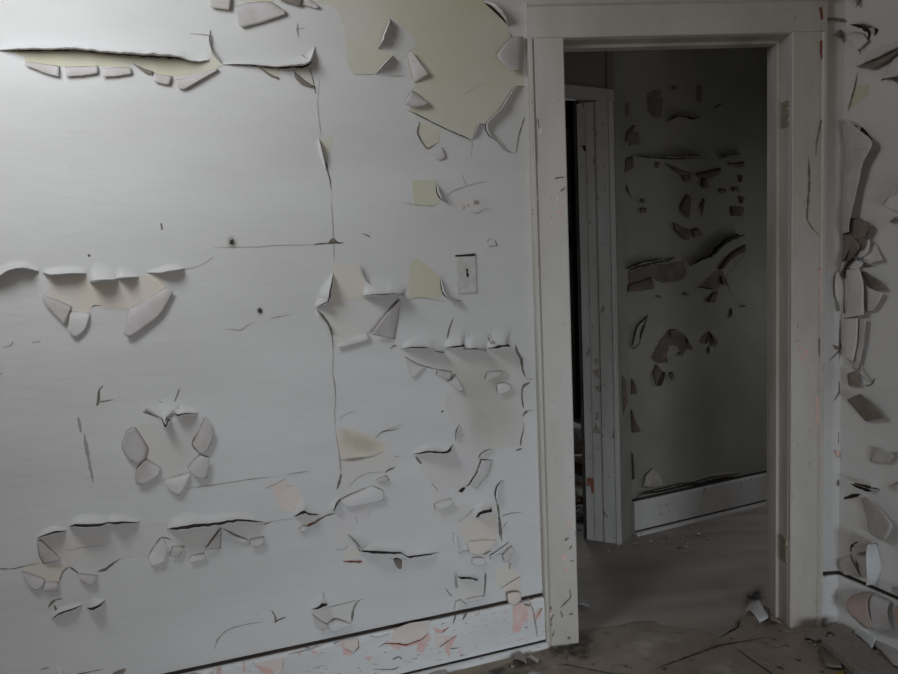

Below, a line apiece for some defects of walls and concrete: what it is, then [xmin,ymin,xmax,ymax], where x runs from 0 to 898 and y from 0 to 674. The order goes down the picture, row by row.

peeling [0,30,316,94]
peeling [209,0,526,160]
peeling [0,254,211,338]
crack [313,85,344,253]
peeling [650,329,719,386]
peeling [625,125,746,318]
peeling [819,7,898,421]
peeling [122,388,213,496]
peeling [0,411,440,619]
peeling [243,259,590,674]
peeling [839,477,892,585]